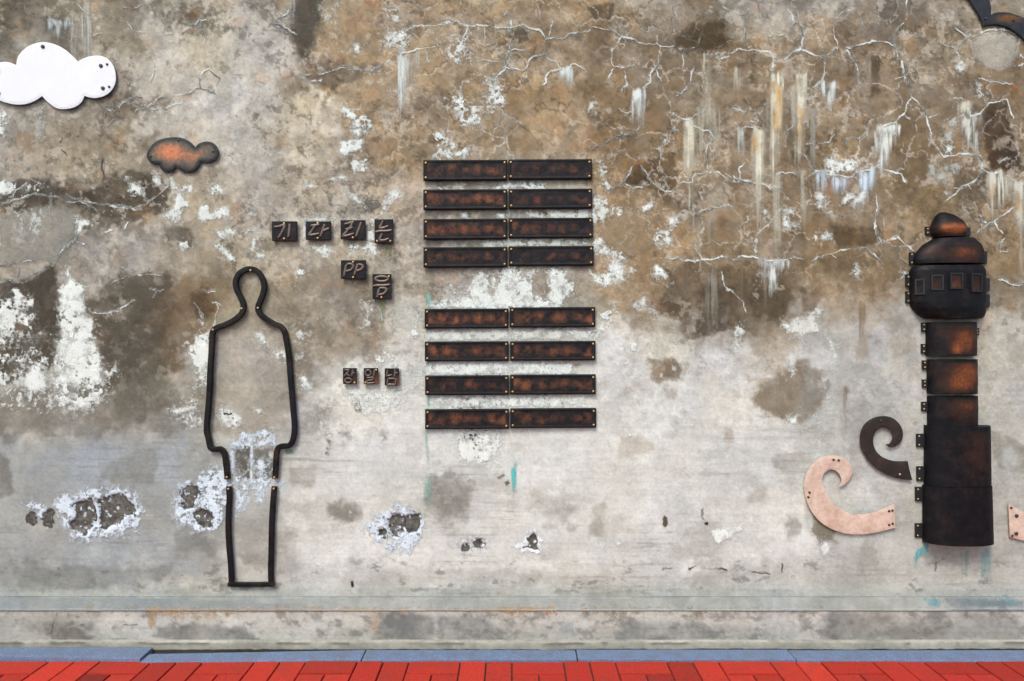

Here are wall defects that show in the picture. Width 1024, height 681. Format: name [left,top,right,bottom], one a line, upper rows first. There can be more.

efflorescence [632,88,645,115]
crack [297,0,1024,312]
leakage [678,18,728,172]
rust [738,72,807,225]
efflorescence [859,124,901,192]
efflorescence [958,83,981,150]
crack [0,183,170,283]
peeling [0,265,117,411]
spalling [25,486,146,543]
spalling [172,409,284,534]
spalling [362,504,425,555]
spalling [456,536,486,554]